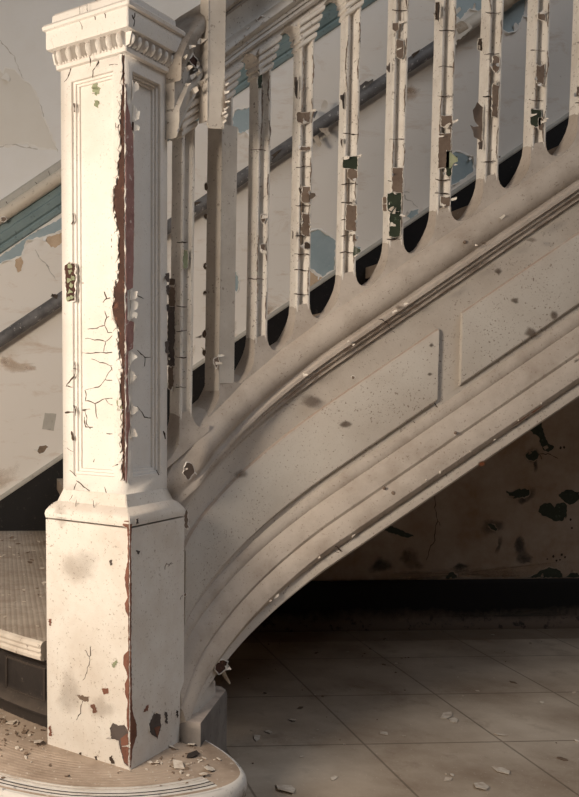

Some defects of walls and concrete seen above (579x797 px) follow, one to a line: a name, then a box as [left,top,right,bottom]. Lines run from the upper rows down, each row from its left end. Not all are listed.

peeling [456,0,481,22]
peeling [503,0,528,36]
peeling [0,216,62,274]
peeling [109,54,140,483]
peeling [292,186,336,286]
crack [52,292,112,507]
peeling [524,422,565,462]
peeling [538,488,579,529]
peeling [106,517,179,767]
peeling [77,694,98,714]